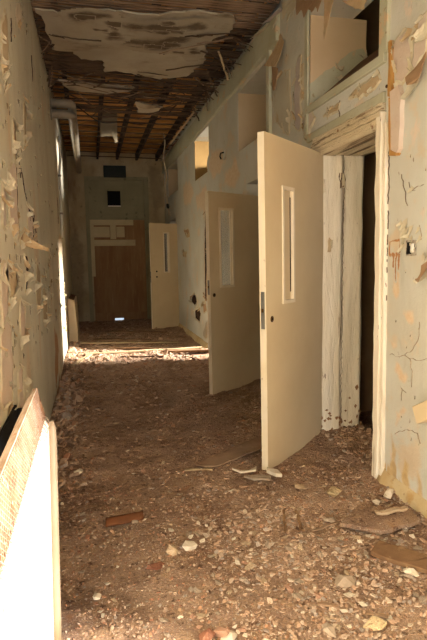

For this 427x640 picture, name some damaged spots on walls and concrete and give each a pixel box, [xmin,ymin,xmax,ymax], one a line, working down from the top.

water stain [58,7,215,62]
peeling [264,34,304,135]
peeling [250,0,334,41]
peeling [342,0,367,10]
peeling [390,11,427,100]
peeling [0,8,67,416]
corrosion [387,237,402,283]
crack [390,322,427,401]
spalling [321,397,362,430]
water stain [385,426,427,500]